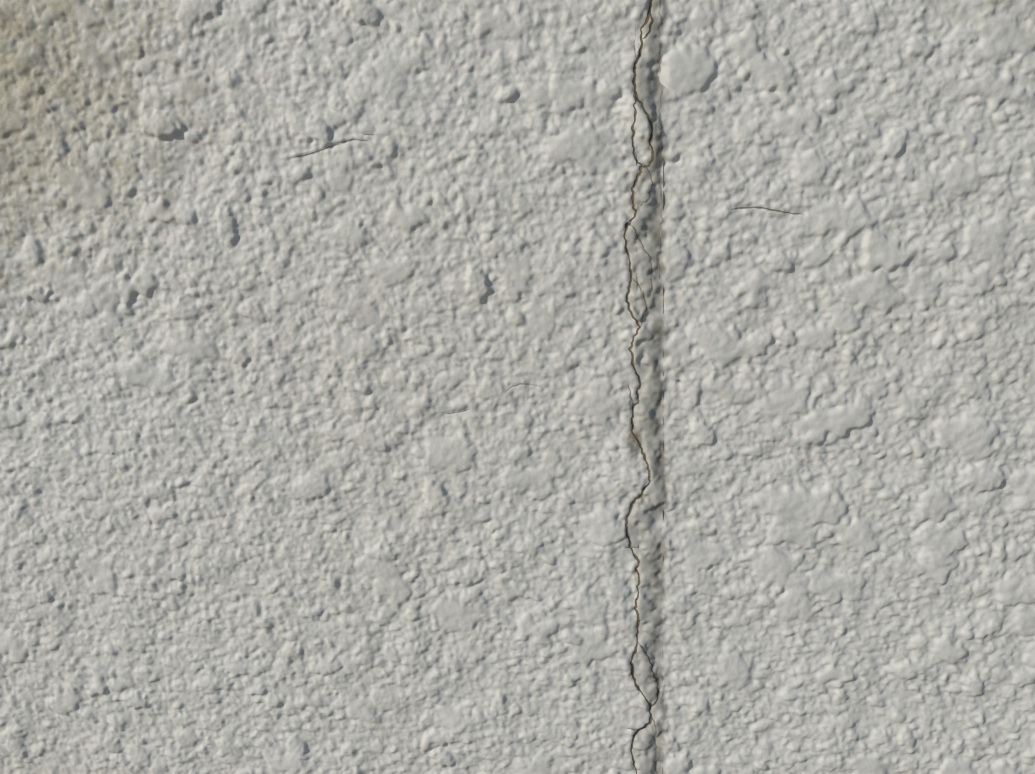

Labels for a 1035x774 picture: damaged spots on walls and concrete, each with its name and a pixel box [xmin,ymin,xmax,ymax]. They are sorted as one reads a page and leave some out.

crack [623,0,663,774]